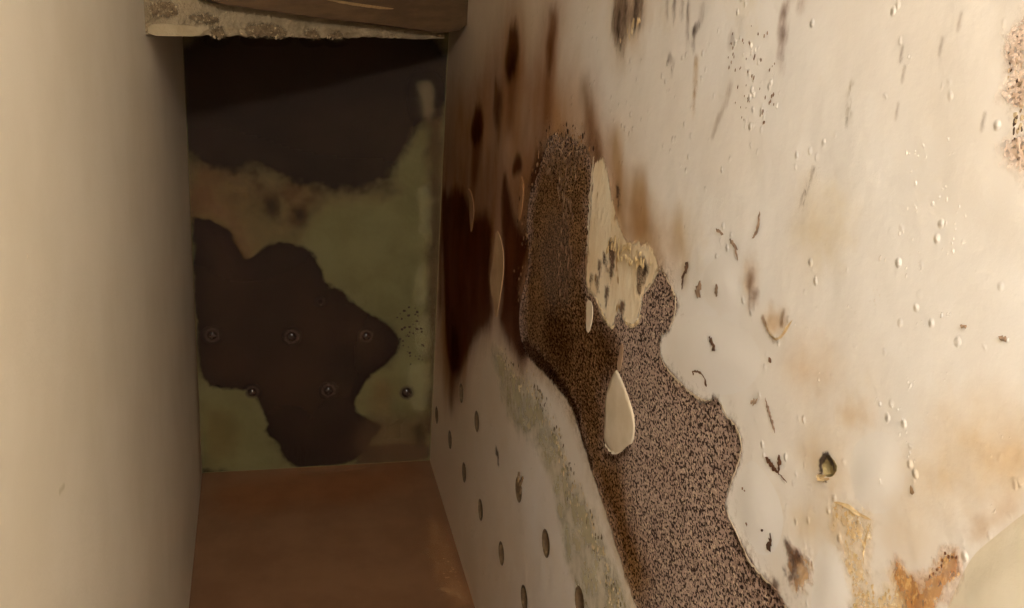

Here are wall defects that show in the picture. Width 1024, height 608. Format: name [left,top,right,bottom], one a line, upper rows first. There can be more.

spalling [147,0,226,40]
spalling [245,22,287,40]
spalling [304,28,344,40]
peeling [1005,25,1024,168]
damp [184,30,527,467]
peeling [490,122,787,608]
spalling [816,452,837,482]
rust [894,552,959,608]